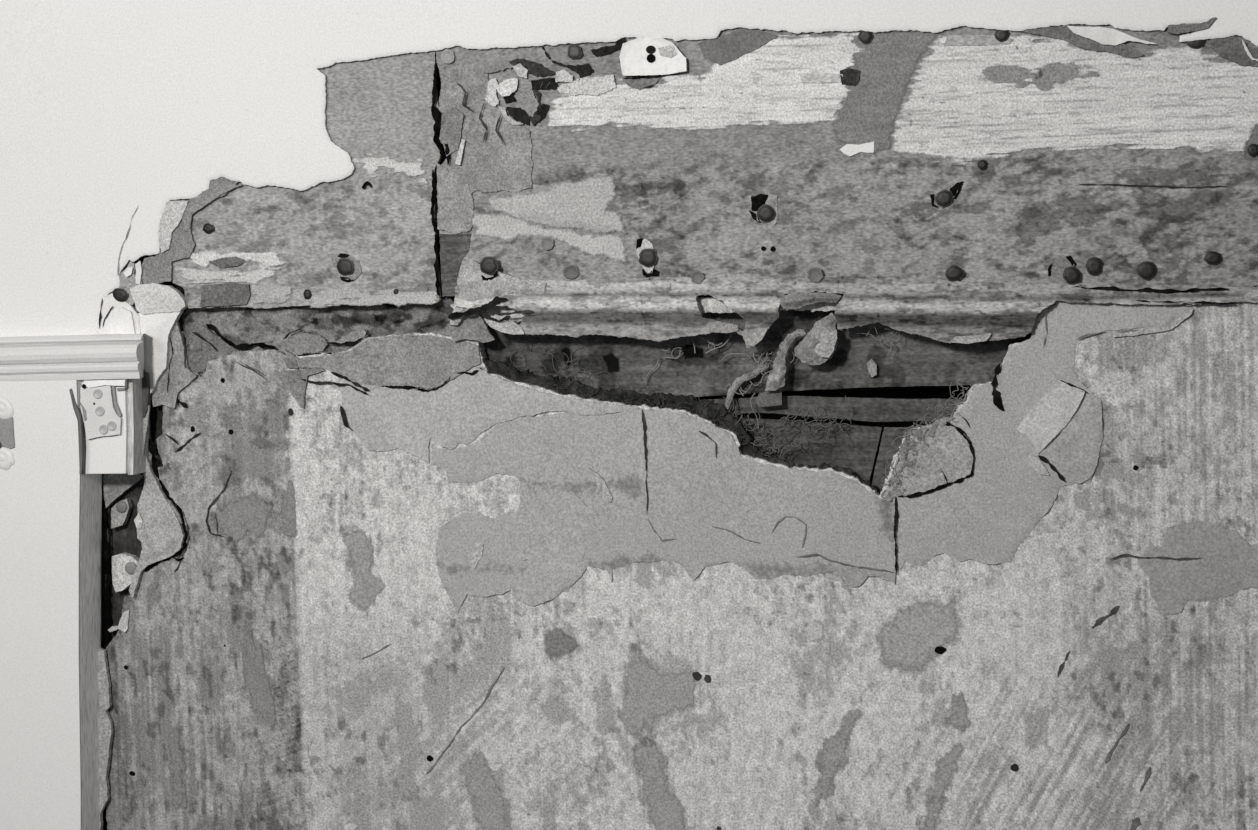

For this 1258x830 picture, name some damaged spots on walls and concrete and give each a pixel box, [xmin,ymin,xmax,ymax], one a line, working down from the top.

crack [144,338,232,572]
crack [430,68,533,322]
peeling [99,107,1196,614]
crack [642,410,673,541]
peeling [479,17,1258,165]
peeling [1243,290,1258,303]